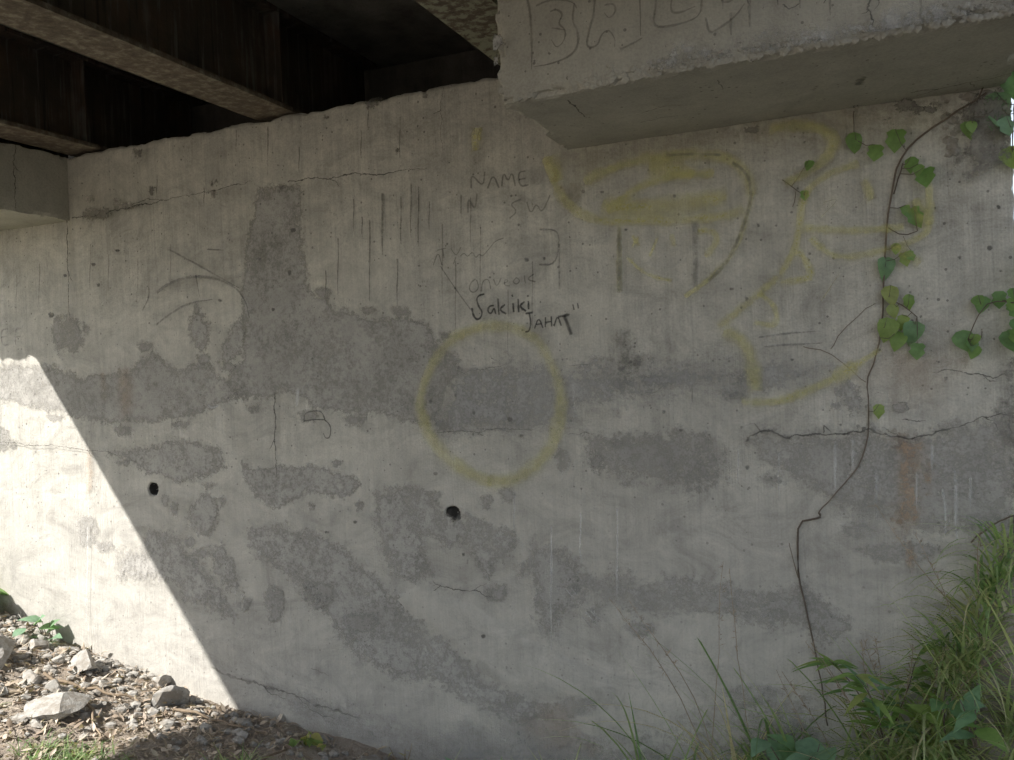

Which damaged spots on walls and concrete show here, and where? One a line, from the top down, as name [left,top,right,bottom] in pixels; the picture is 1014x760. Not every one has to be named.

water stain [432,358,808,434]
crack [746,413,1006,442]